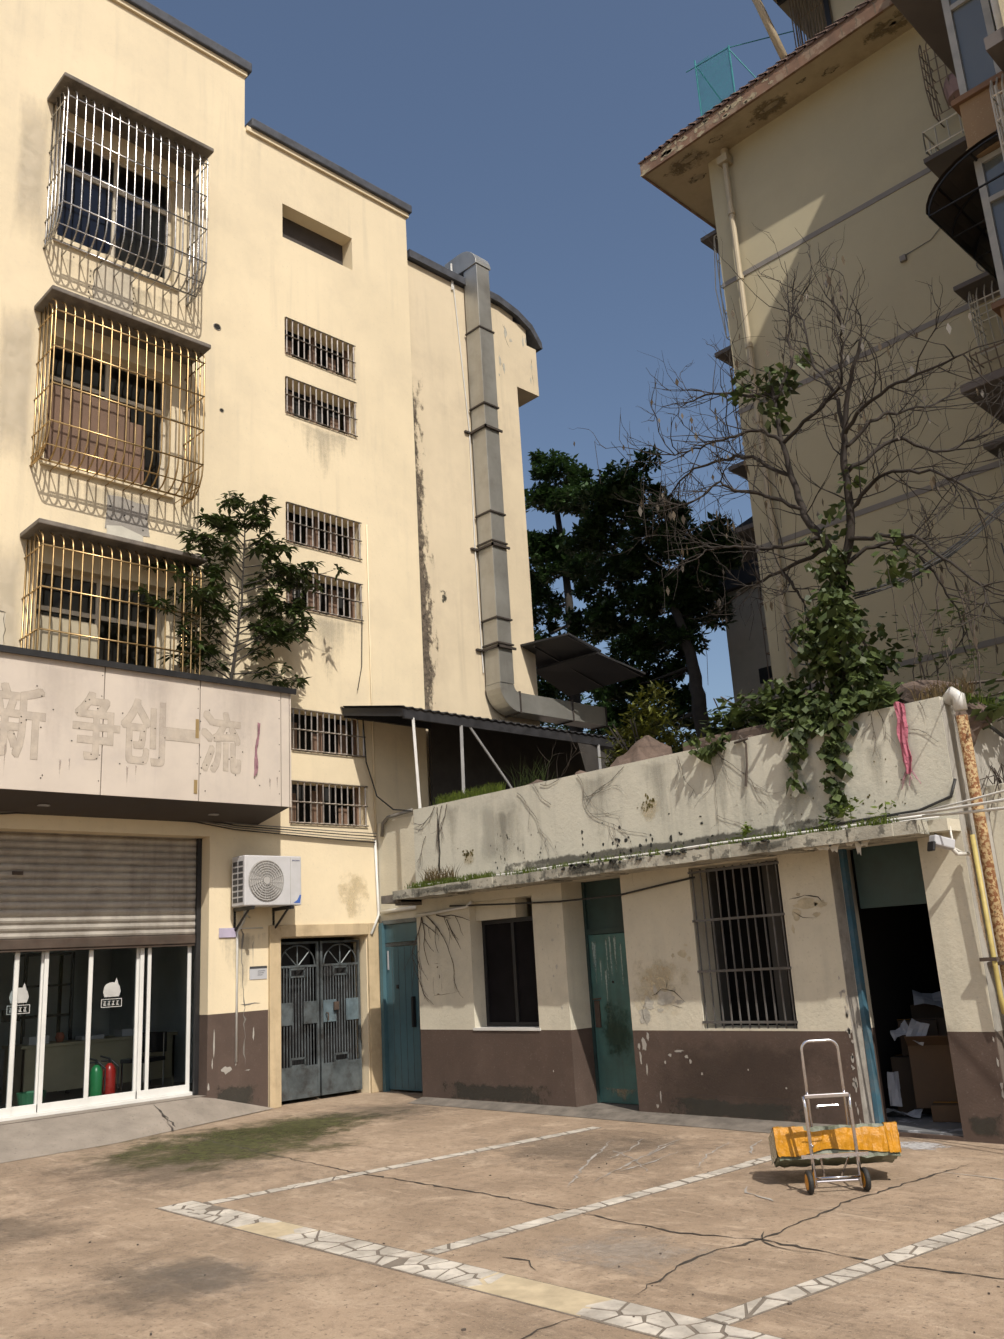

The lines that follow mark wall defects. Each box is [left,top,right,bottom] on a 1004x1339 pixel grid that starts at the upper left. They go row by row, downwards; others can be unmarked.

leakage [413,413,438,709]
leakage [490,794,817,875]
corrosion [967,828,985,936]
peeling [638,986,685,1073]